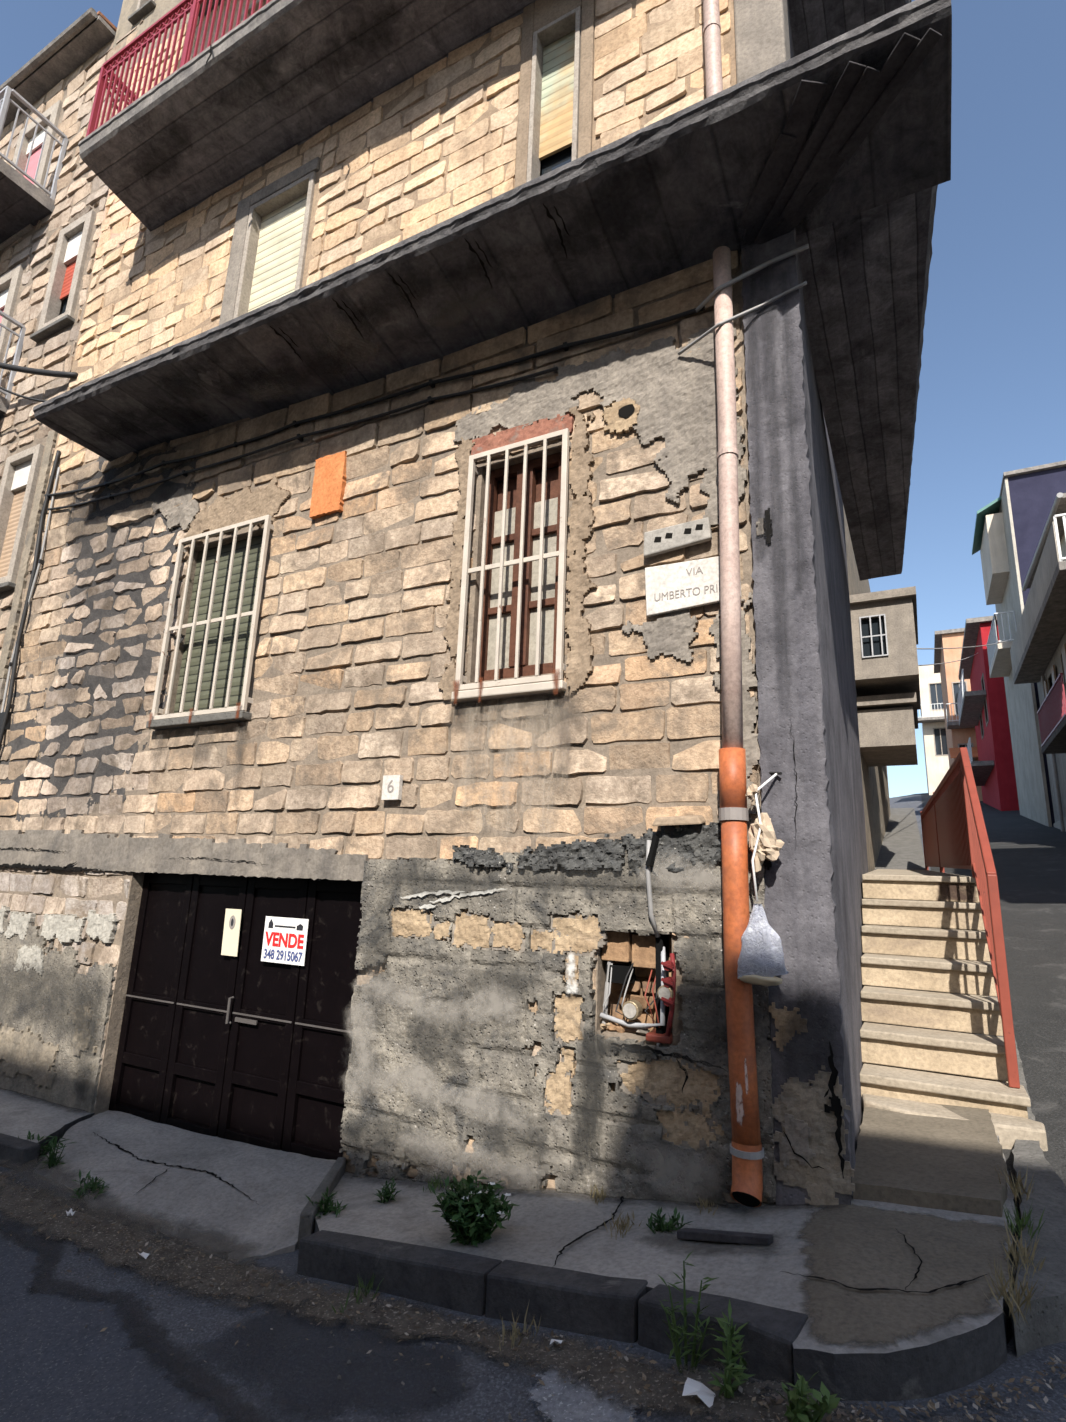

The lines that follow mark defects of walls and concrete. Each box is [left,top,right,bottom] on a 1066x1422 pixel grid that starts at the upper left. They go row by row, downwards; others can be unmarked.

peeling [438,321,721,703]
peeling [0,446,205,822]
leakage [400,888,505,909]
leakage [654,861,720,884]
leakage [567,954,578,993]
crack [93,1132,259,1205]
leakage [348,1007,511,1119]
flaking render [615,1052,748,1154]
flaking render [772,1065,855,1207]
crack [783,1042,845,1179]
crack [552,1196,624,1268]
crack [781,1228,990,1293]